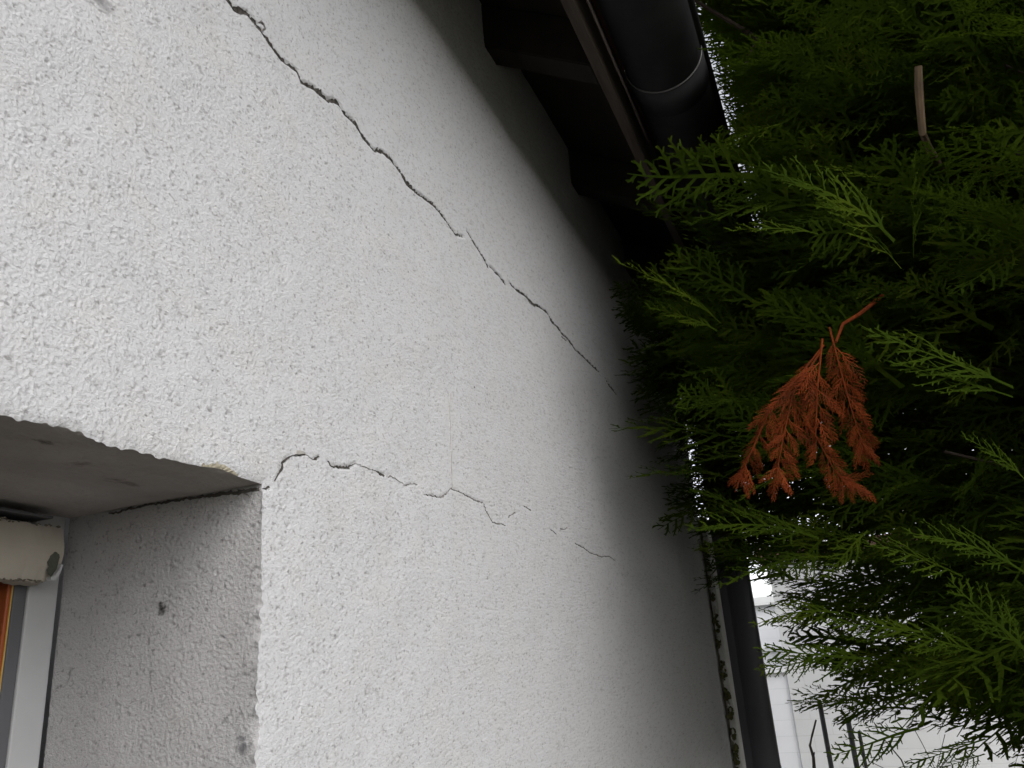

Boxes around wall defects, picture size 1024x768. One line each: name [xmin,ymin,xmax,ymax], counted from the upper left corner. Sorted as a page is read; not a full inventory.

crack [226,0,616,394]
crack [108,393,531,526]